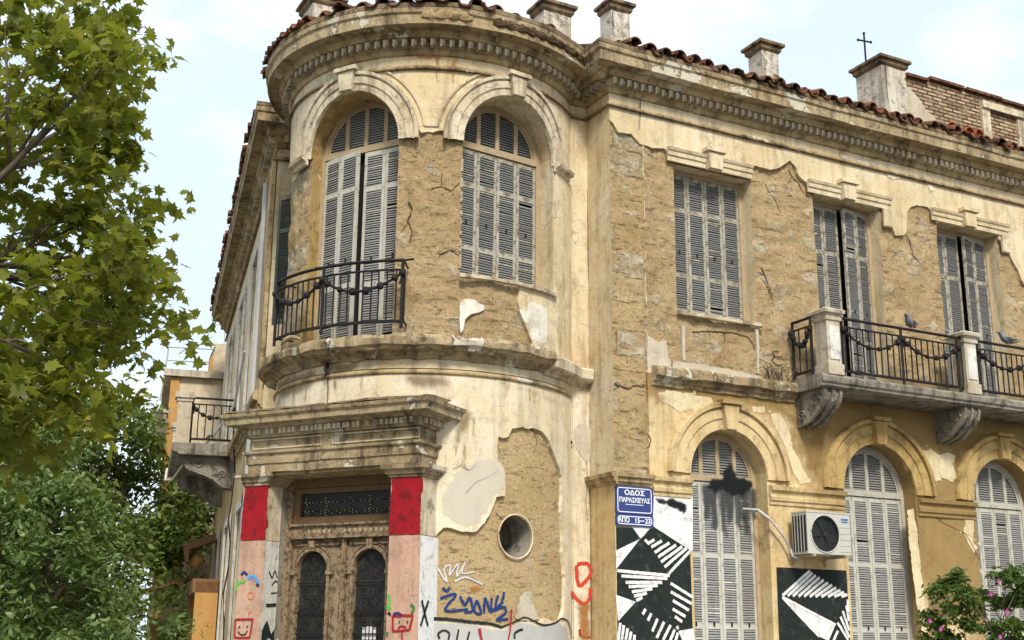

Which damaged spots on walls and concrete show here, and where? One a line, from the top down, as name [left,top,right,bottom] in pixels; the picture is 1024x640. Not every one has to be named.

flaking render [281,158,313,350]
crack [401,174,459,241]
flaking render [392,130,530,345]
flaking render [437,427,562,626]
crack [609,383,644,391]
flaking render [607,123,820,474]
peeling [752,406,811,487]
crack [765,169,807,213]
flaking render [878,206,949,391]
peeling [923,445,958,482]
flaking render [996,240,1024,401]